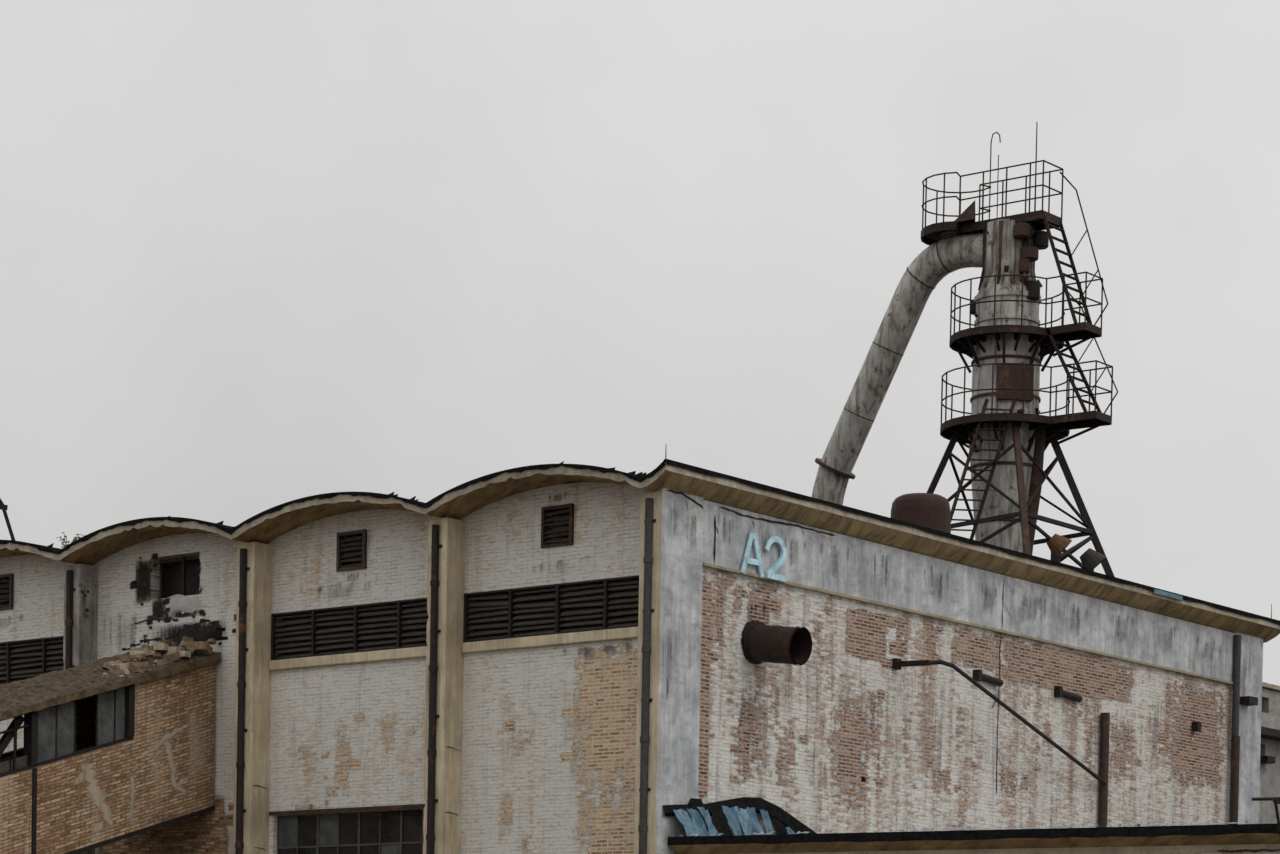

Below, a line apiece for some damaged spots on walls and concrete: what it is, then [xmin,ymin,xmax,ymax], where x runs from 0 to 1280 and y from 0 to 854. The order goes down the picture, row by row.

spalling [130,553,236,648]
peeling [498,787,528,852]
peeling [561,639,638,854]
peeling [698,572,809,800]
peeling [812,606,908,811]
peeling [897,713,912,766]
peeling [926,626,1141,797]
peeling [1157,681,1225,788]